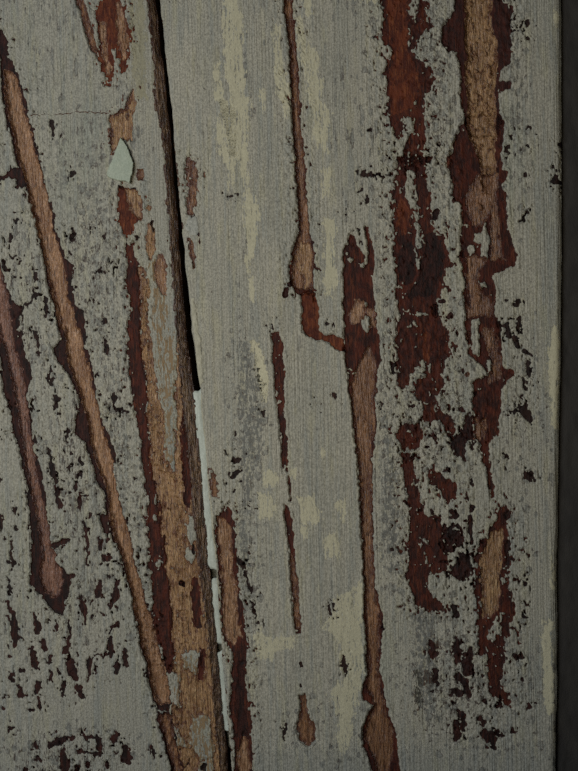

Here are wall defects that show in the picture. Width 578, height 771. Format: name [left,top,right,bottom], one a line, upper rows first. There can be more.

peeling [0,0,265,771]
spalling [265,316,302,634]
peeling [275,0,541,771]